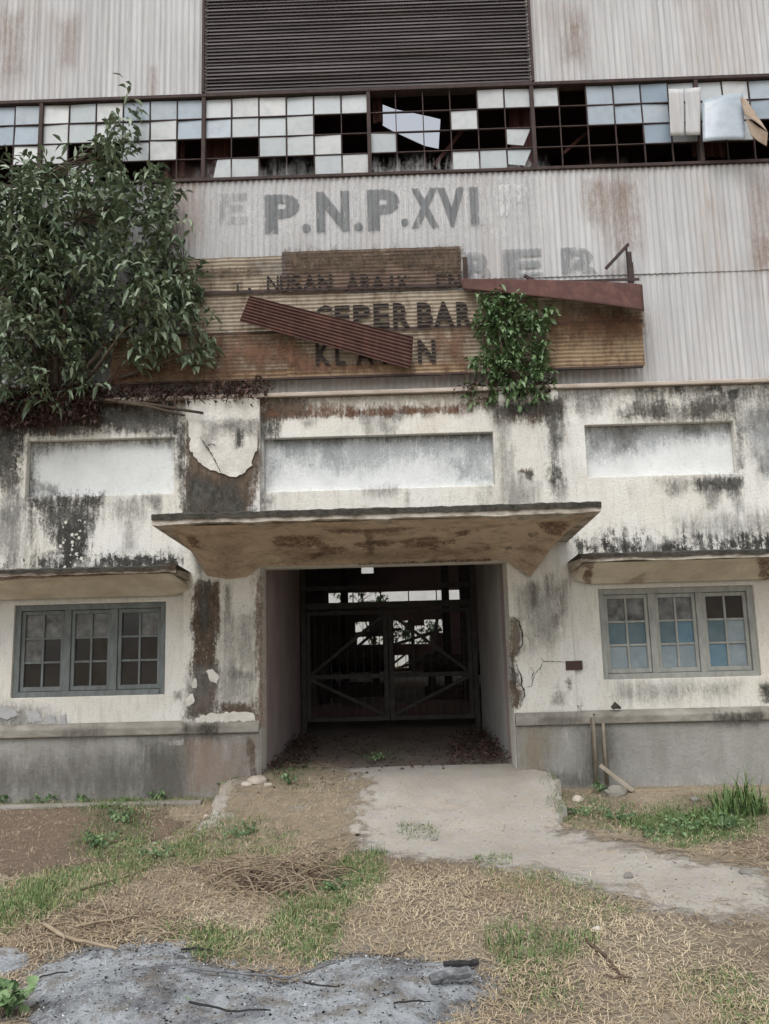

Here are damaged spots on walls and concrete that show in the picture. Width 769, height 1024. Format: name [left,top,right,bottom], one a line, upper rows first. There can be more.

leakage [0,402,185,581]
spalling [183,393,492,513]
leakage [323,390,602,493]
leakage [577,528,649,554]
leakage [591,384,769,506]
leakage [658,515,769,551]
spalling [185,579,255,723]
spalling [509,618,522,709]
crack [513,617,565,700]